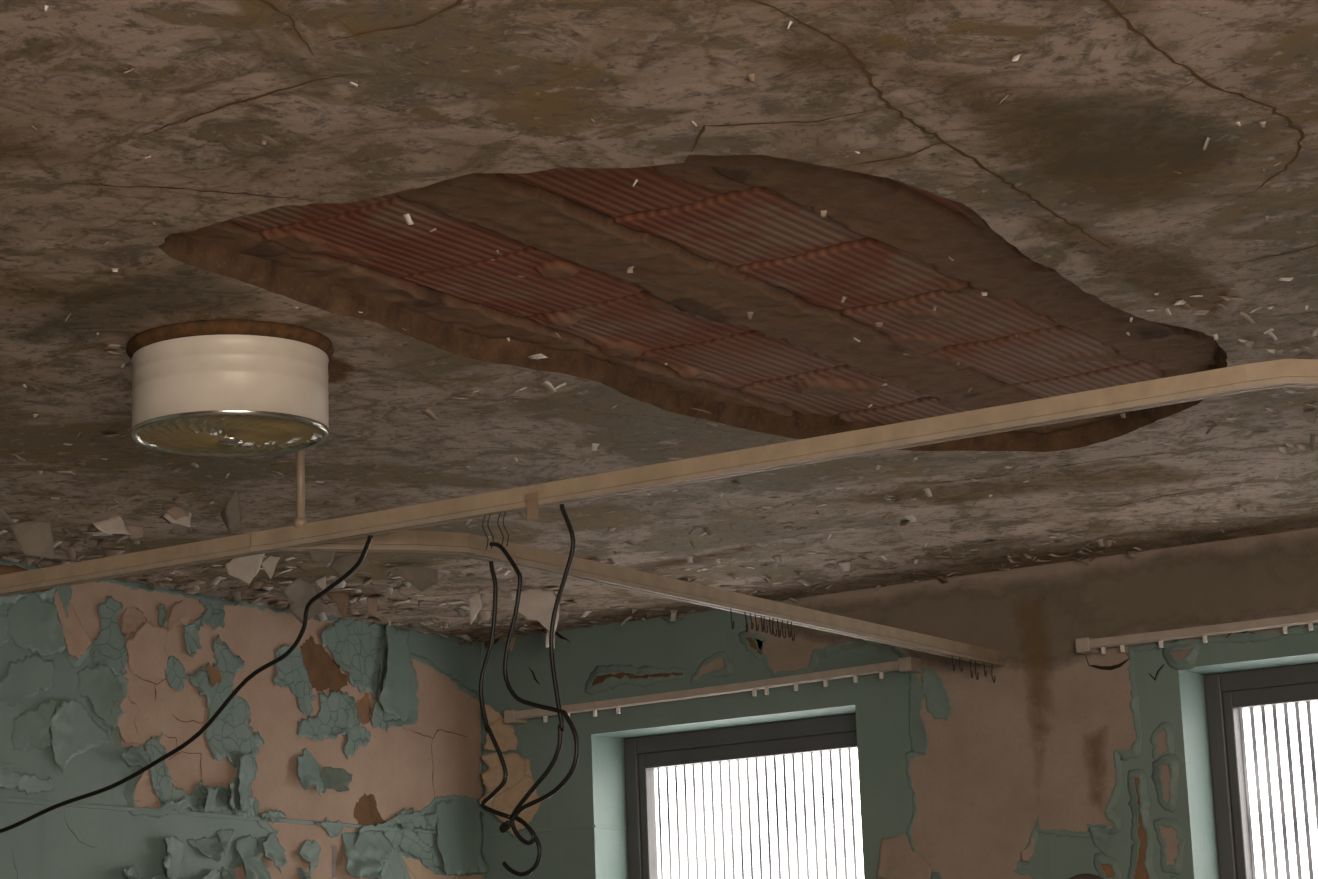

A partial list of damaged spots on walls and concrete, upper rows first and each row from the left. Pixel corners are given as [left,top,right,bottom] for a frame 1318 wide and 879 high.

crack [145,0,463,135]
crack [691,0,1111,249]
crack [1102,0,1305,218]
crack [91,184,313,201]
corrosion [328,358,354,383]
flaking render [158,232,877,439]
flaking render [898,399,1204,468]
flaking render [1208,334,1228,370]
peeling [1126,287,1318,355]
peeling [0,488,152,575]
peeling [658,465,1318,610]
peeling [738,608,1318,879]